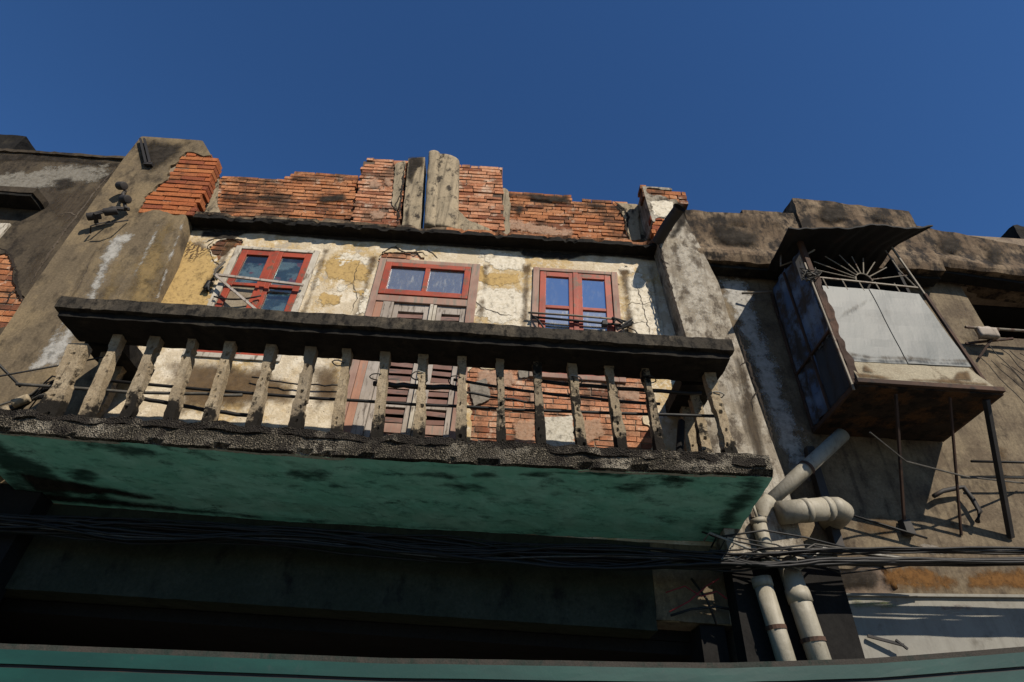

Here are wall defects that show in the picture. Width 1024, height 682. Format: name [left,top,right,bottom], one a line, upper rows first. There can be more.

spalling [131,153,243,305]
spalling [0,254,23,328]
peeling [310,252,424,314]
peeling [475,252,530,325]
crack [609,244,683,334]
spalling [467,368,652,450]
leakage [737,359,764,455]
corrosion [884,567,955,589]
corrosion [968,568,1024,588]